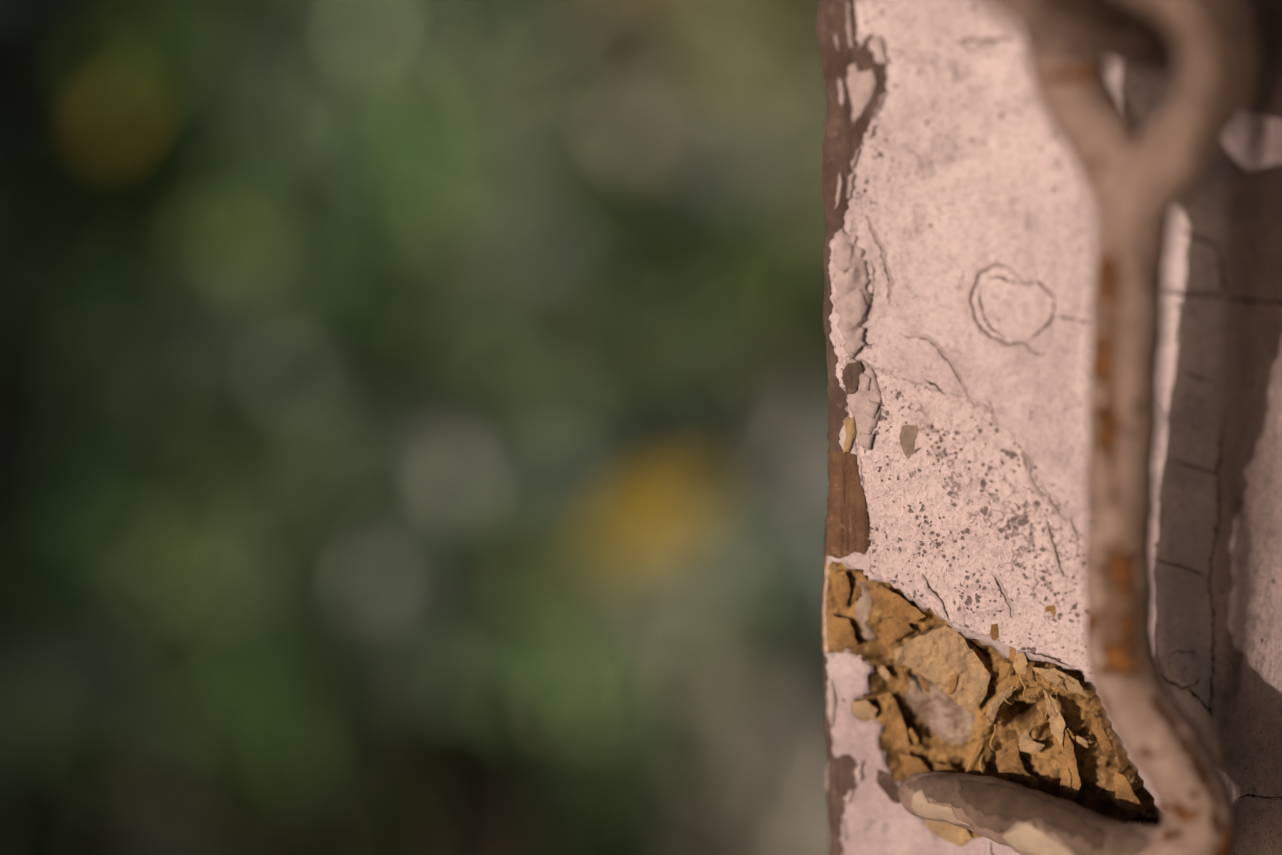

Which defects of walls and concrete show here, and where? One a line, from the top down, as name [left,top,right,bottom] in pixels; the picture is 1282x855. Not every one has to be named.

crack [865,214,895,308]
spalling [816,0,1163,855]
crack [906,334,1083,577]
crack [966,260,1091,357]
corrosion [1091,252,1121,501]
crack [1164,228,1282,306]
corrosion [1087,544,1141,711]
corrosion [1150,697,1232,855]